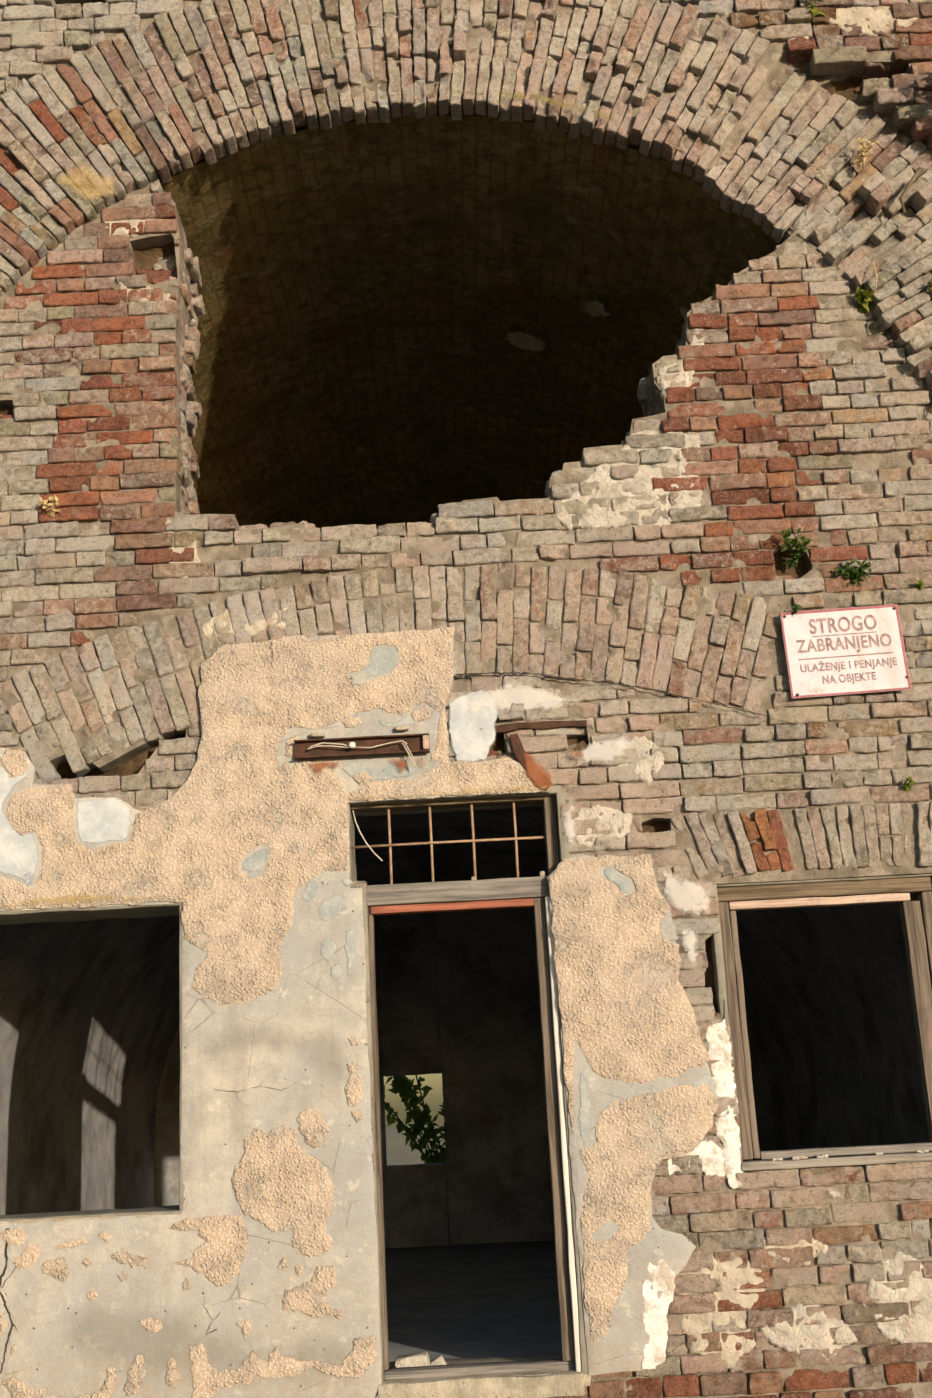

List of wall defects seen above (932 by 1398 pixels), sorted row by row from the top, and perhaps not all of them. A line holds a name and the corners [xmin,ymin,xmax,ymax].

peeling [0,748,38,884]
peeling [77,797,131,843]
corrosion [524,753,552,789]
peeling [345,1037,364,1122]
peeling [626,935,743,1189]
crack [0,1227,18,1384]
peeling [0,1228,149,1283]
peeling [170,1108,343,1319]
spalling [641,1237,857,1370]
spalling [862,1251,932,1344]
peeling [77,1354,146,1398]
peeling [166,1319,378,1398]